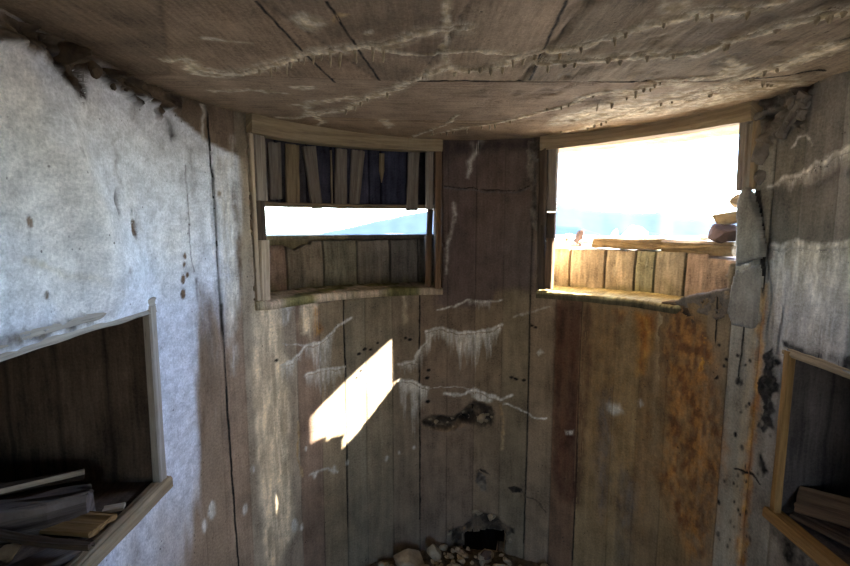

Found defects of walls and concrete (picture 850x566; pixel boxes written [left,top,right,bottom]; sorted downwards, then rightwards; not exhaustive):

spalling [0,11,184,128]
leakage [148,0,850,139]
leakage [443,200,459,277]
spalling [727,72,845,329]
leakage [765,132,850,202]
leakage [161,103,354,566]
spalling [419,399,496,433]
leakage [395,305,551,453]
corrosion [548,300,735,566]
leakage [715,235,850,566]
spalling [446,509,517,554]